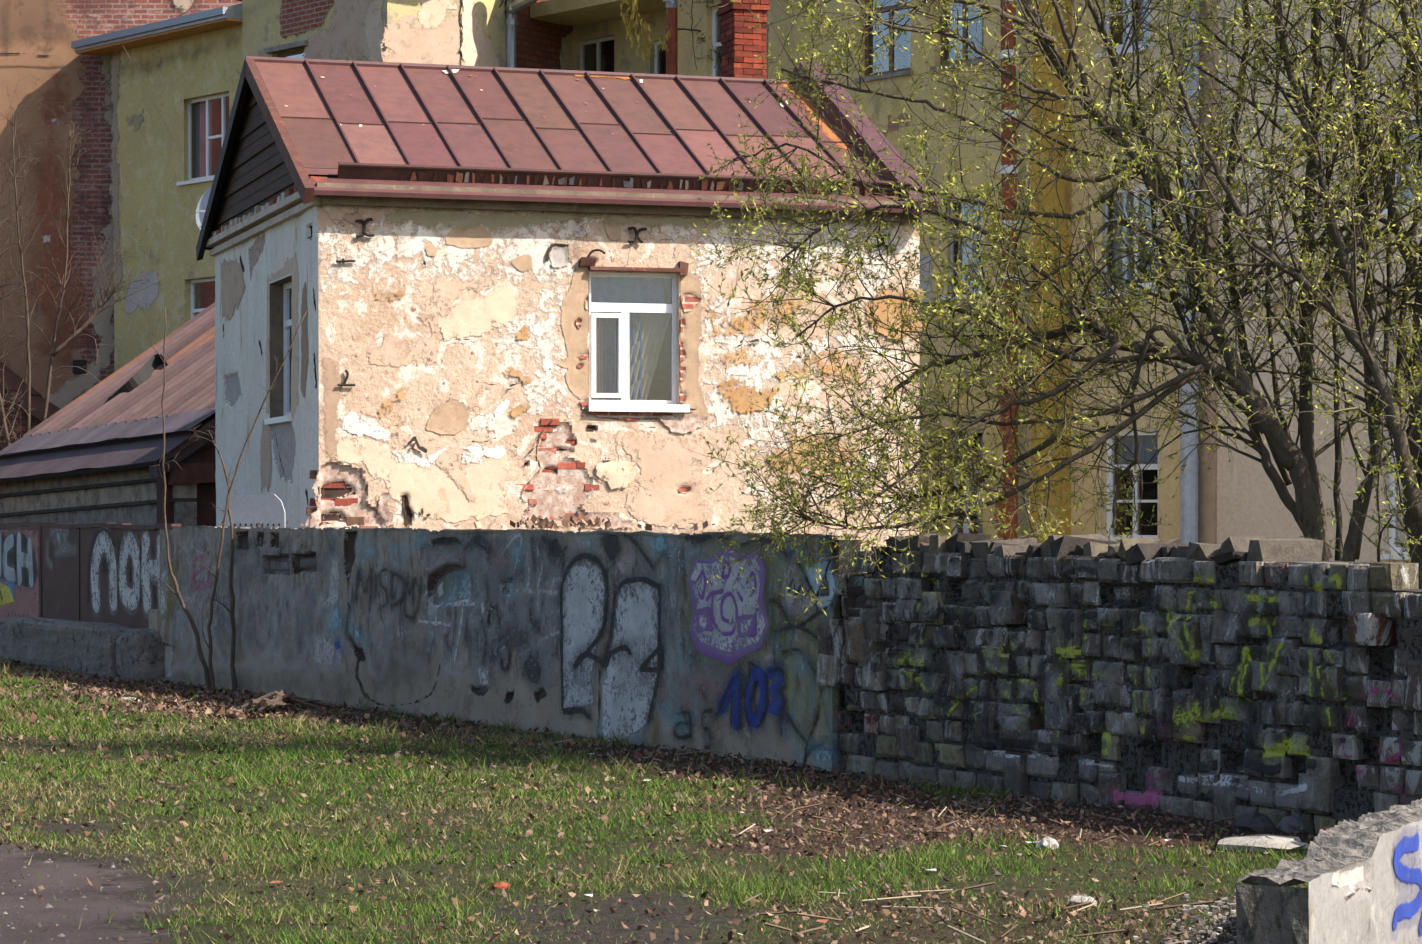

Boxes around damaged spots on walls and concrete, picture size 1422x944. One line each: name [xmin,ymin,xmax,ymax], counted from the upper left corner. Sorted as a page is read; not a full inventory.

flaking render [49,52,123,409]